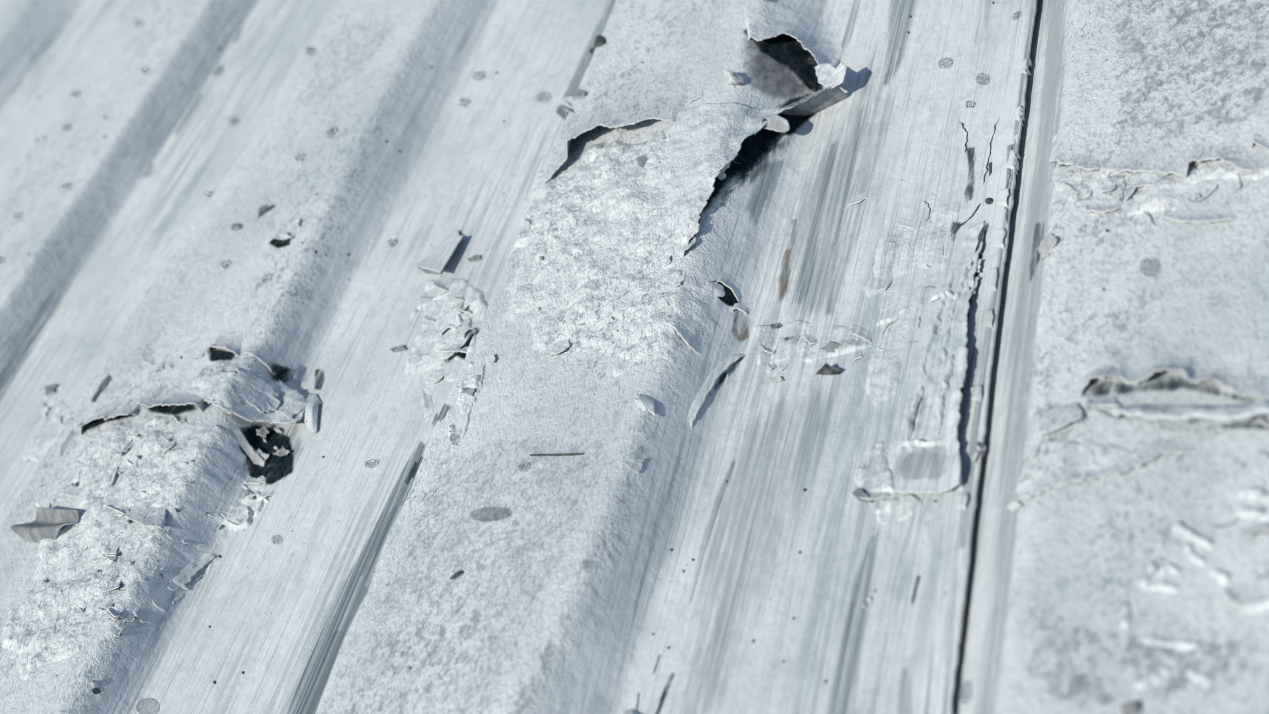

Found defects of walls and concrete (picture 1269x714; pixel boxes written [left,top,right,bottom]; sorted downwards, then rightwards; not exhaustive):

peeling [0,329,324,680]
peeling [390,230,489,421]
peeling [753,193,1006,525]
peeling [982,0,1269,714]